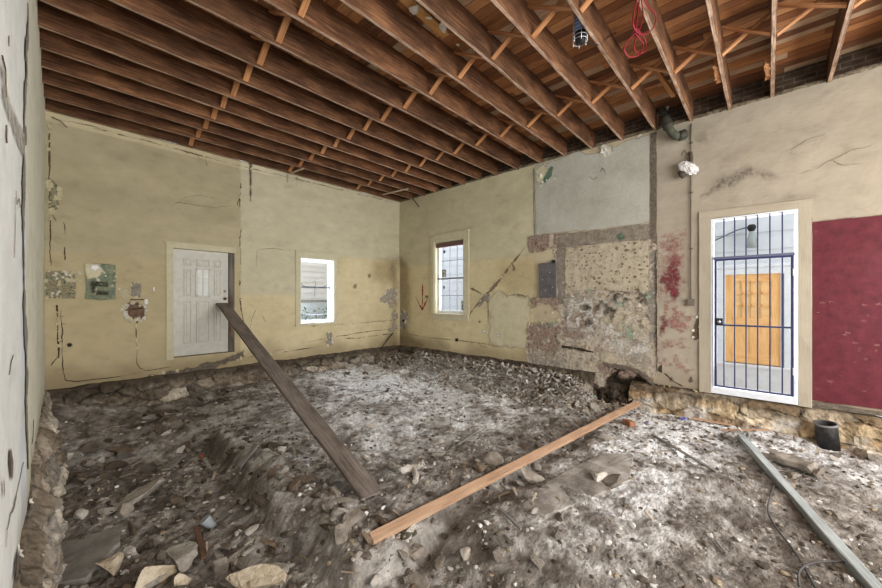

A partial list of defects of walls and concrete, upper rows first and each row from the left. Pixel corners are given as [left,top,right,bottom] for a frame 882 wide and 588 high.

peeling [45,179,63,214]
flaking render [44,263,150,323]
crack [6,4,390,547]
peeling [380,288,408,331]
crack [469,247,526,317]
flaking render [482,134,662,389]